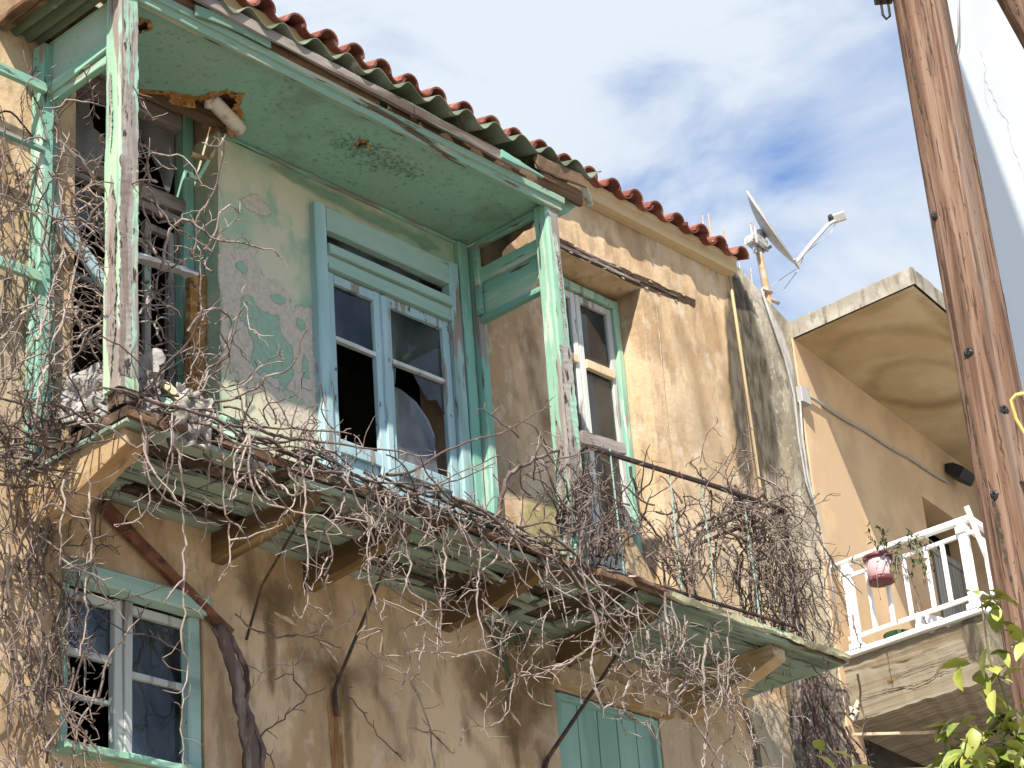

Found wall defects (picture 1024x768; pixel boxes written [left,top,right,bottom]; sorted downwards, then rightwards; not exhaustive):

peeling [218,236,318,451]
water stain [726,276,778,500]